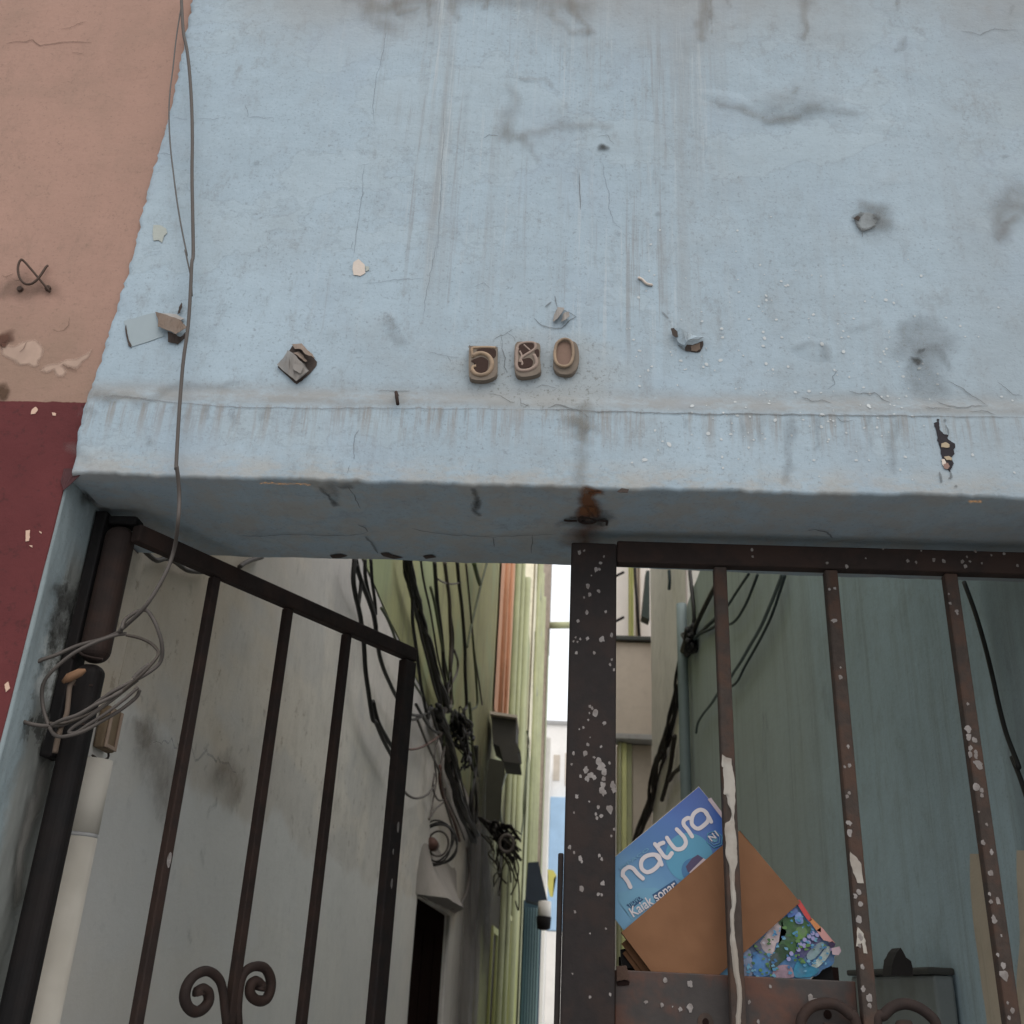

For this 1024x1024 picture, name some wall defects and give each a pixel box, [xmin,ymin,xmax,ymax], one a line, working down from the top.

spalling [852,212,880,237]
peeling [2,340,90,376]
peeling [934,419,957,487]
corrosion [577,487,603,543]